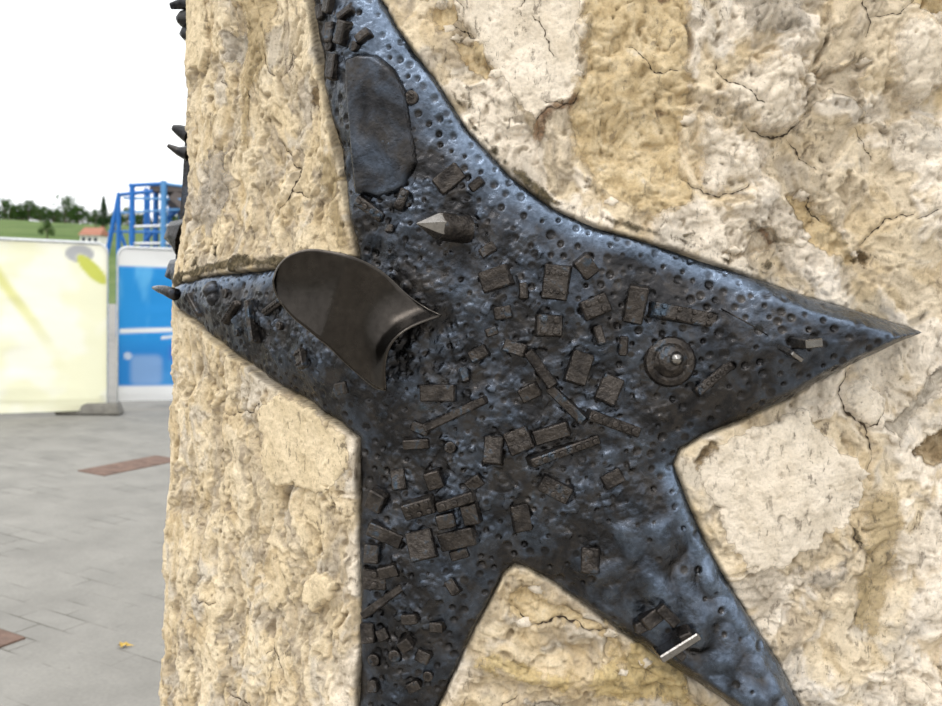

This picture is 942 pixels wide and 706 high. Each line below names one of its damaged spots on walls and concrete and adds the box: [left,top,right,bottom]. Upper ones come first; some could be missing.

crack [861,0,914,36]
crack [746,118,815,168]
crack [683,180,749,198]
crack [861,209,938,244]
crack [838,372,884,469]